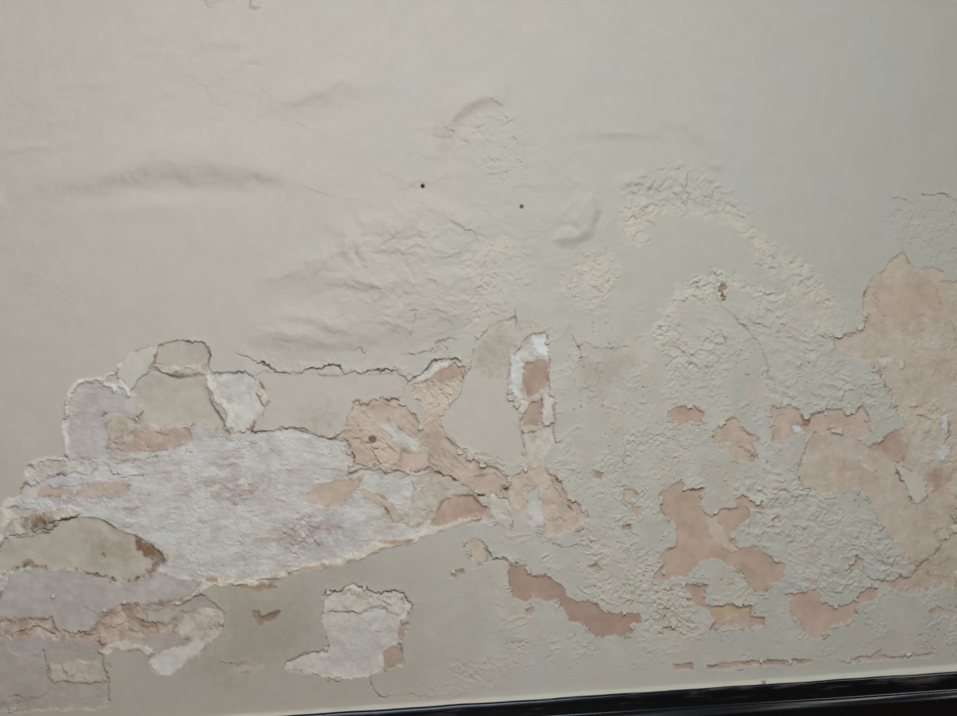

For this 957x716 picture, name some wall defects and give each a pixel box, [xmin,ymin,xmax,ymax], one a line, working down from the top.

spalling [0,333,590,713]
peeling [463,253,957,642]
peeling [708,658,813,670]